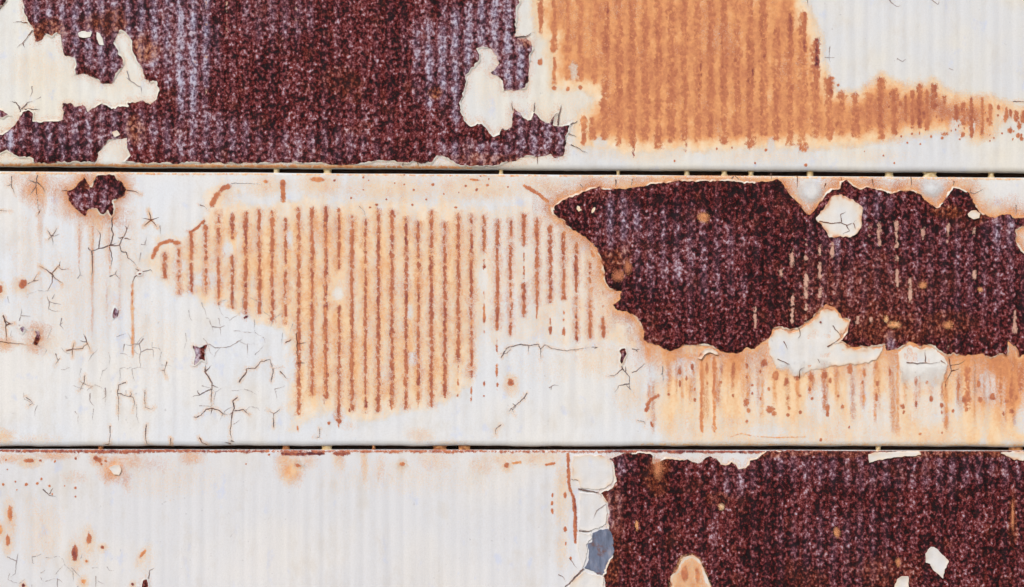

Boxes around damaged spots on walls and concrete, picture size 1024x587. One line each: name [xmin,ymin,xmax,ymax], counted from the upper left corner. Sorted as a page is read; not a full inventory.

peeling [0,0,575,231]
rust [528,0,1024,166]
crack [0,175,309,446]
rust [0,163,1024,587]
crack [493,341,601,439]
crack [605,348,665,430]
peeling [532,175,1024,388]
crack [571,479,606,532]
peeling [569,450,1024,587]